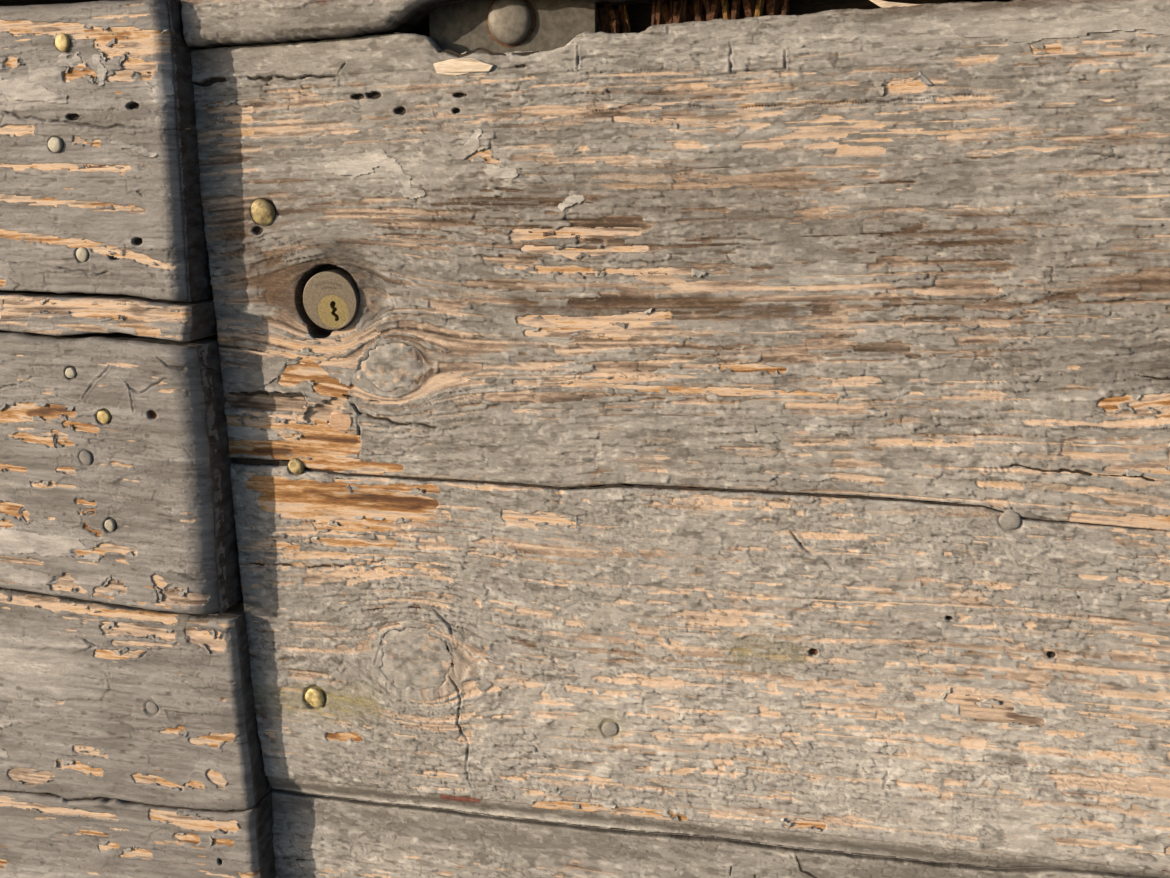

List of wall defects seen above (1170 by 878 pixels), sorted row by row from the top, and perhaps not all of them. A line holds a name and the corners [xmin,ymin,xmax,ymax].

peeling [0,19,175,107]
peeling [0,125,35,137]
peeling [0,163,131,173]
peeling [0,194,146,214]
peeling [0,229,175,270]
peeling [0,402,100,448]
peeling [1097,393,1170,418]
crack [231,394,1156,530]
peeling [226,416,441,550]
peeling [0,499,227,660]
peeling [0,745,108,785]
peeling [132,769,230,791]